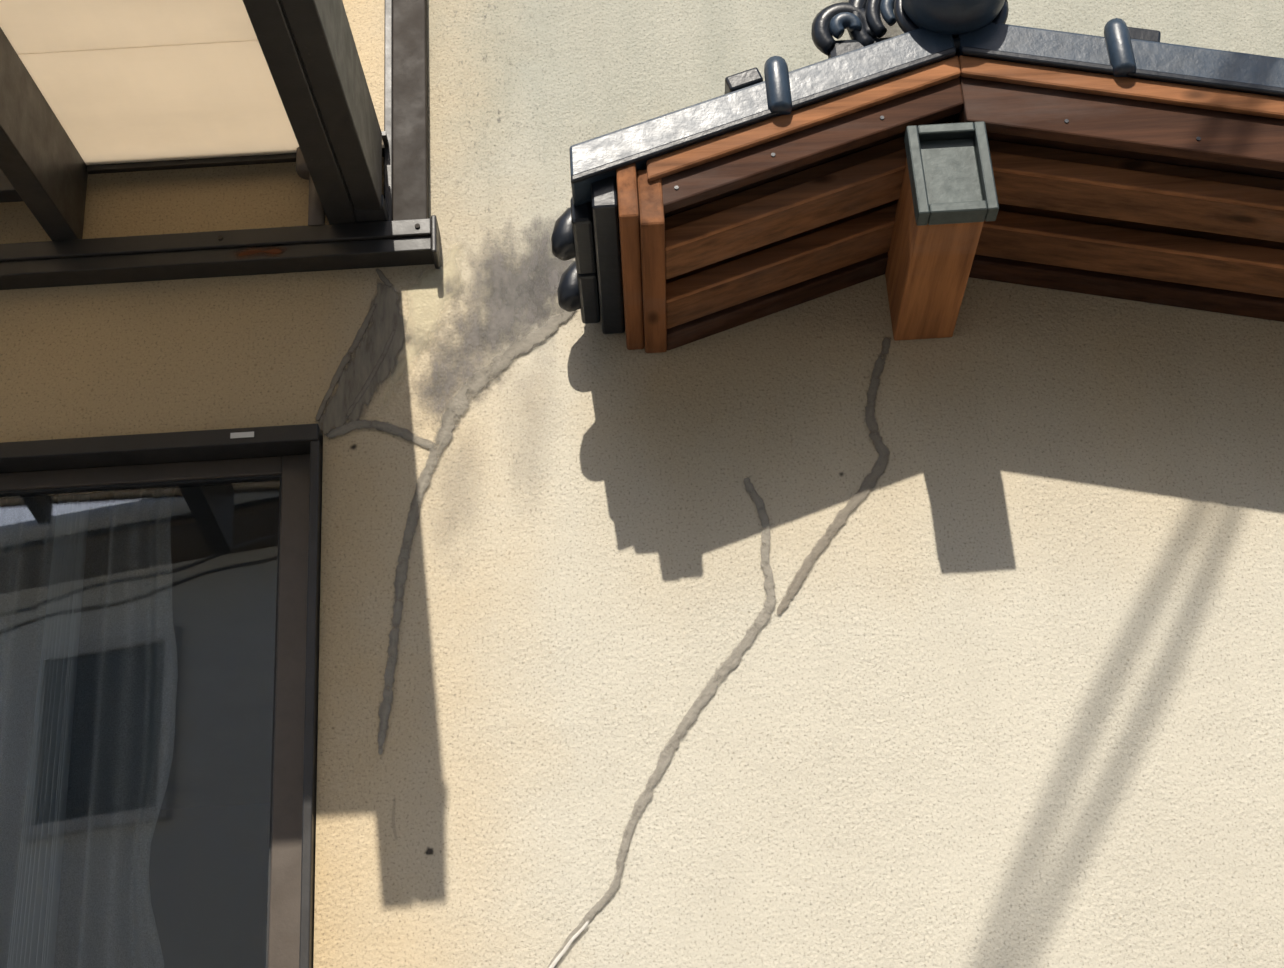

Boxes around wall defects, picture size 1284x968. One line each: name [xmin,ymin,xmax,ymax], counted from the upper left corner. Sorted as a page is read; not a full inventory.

crack [326,311,574,754]
crack [548,337,890,968]